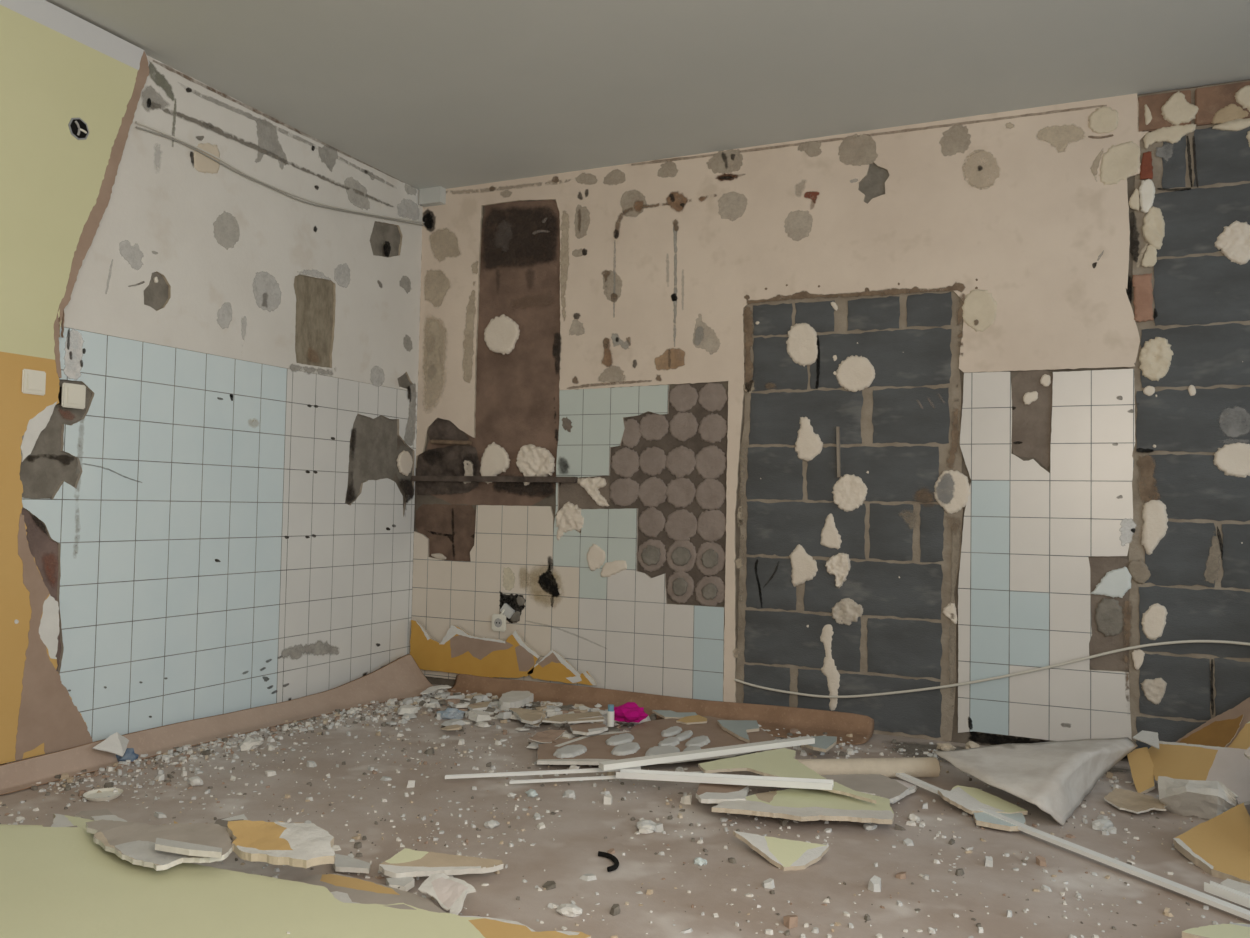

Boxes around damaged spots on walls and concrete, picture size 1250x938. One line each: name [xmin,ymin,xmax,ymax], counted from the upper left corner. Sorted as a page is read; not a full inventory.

flaking render [1211,104,1250,131]
flaking render [213,211,240,249]
flaking render [344,170,435,257]
flaking render [572,169,625,257]
flaking render [1126,104,1196,322]
peeling [253,264,350,375]
flaking render [693,314,720,354]
peeling [743,279,978,394]
peeling [15,51,176,761]
peeling [345,367,480,561]
peeling [555,334,745,606]
peeling [1011,370,1053,469]